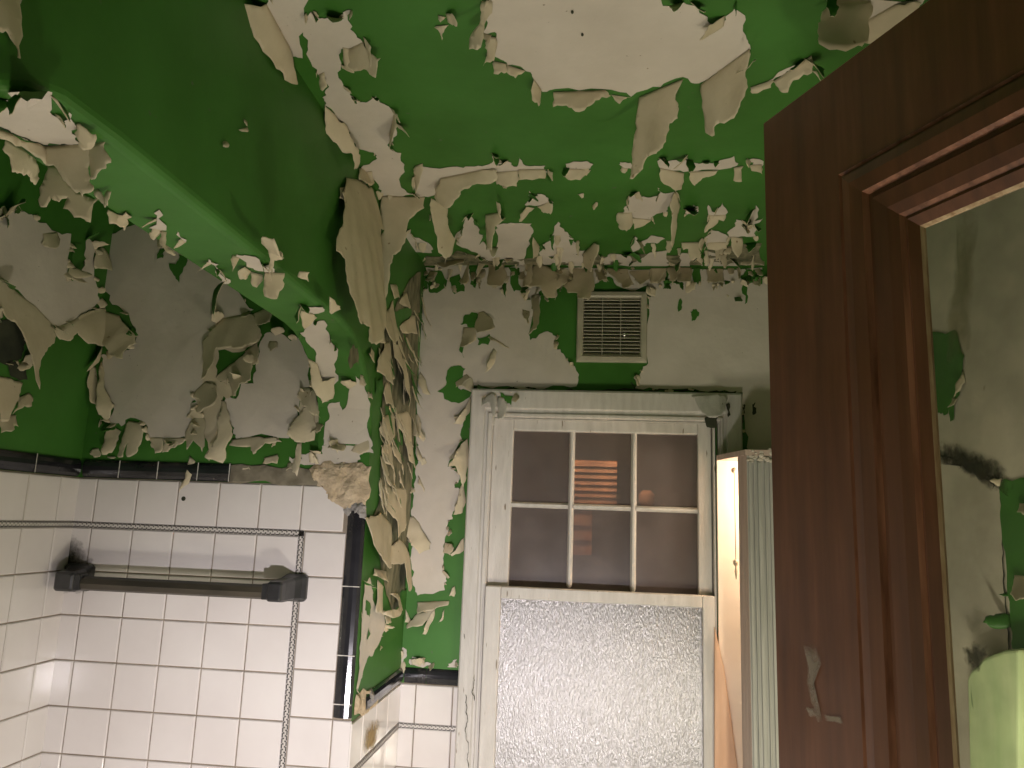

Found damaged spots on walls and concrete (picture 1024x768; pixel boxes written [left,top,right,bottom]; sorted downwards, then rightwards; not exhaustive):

peeling [0,0,825,716]
peeling [933,330,965,422]
water stain [940,447,1001,486]
peeling [983,478,1024,649]